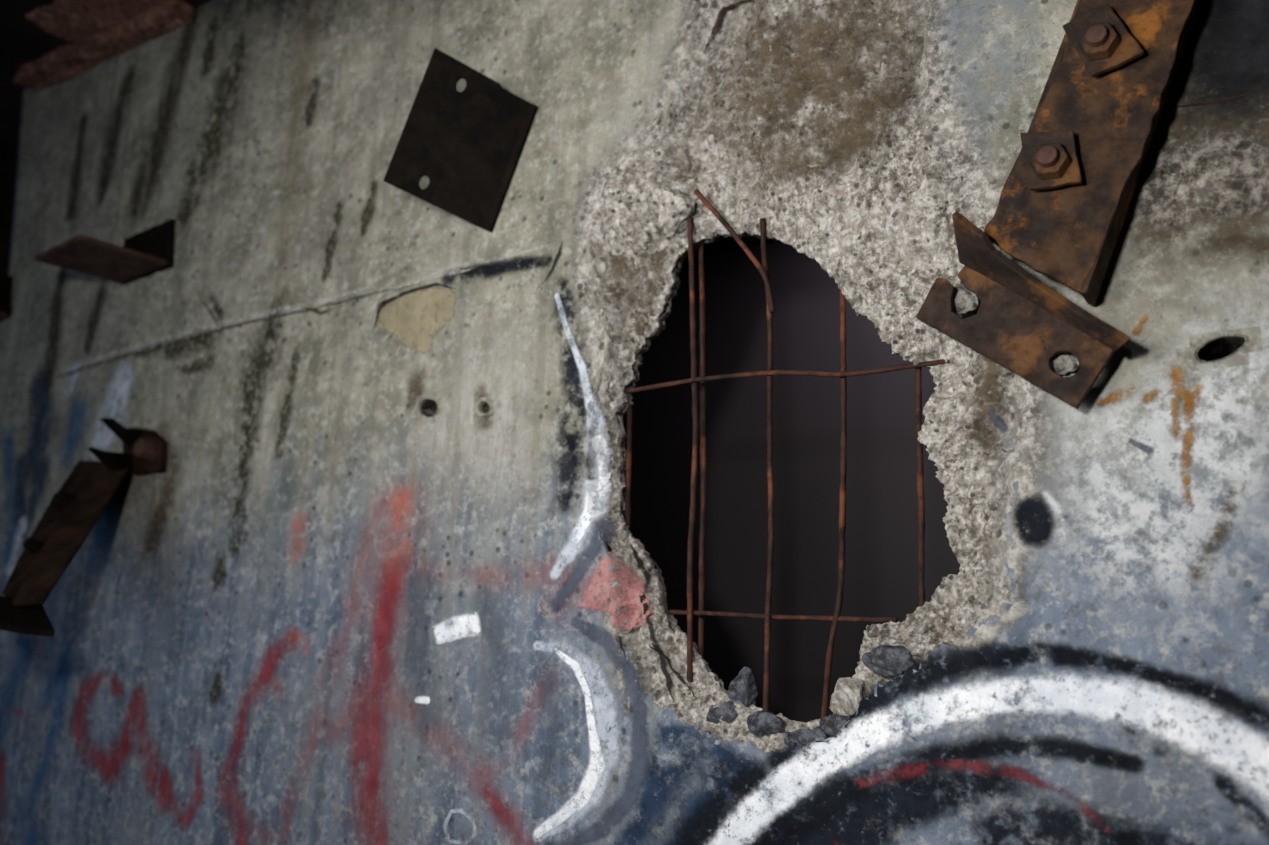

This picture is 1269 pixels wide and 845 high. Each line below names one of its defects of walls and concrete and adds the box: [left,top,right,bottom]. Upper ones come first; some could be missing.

leakage [67,115,86,219]
leakage [98,70,133,200]
leakage [129,0,309,226]
leakage [306,79,318,127]
leakage [322,202,342,281]
leakage [361,180,377,236]
leakage [43,268,66,389]
leakage [85,286,104,353]
flaking render [373,269,470,353]
spalling [572,0,1065,752]
spalling [1129,439,1153,453]
corrosion [1097,368,1200,505]